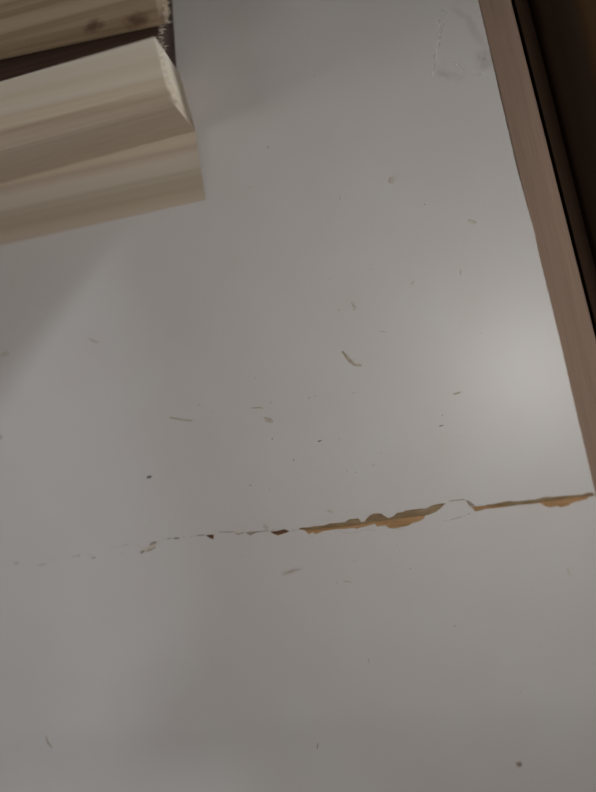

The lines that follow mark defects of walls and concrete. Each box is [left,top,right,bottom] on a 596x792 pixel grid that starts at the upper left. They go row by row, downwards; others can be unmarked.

crack [230,529,314,537]
peeling [270,492,596,536]